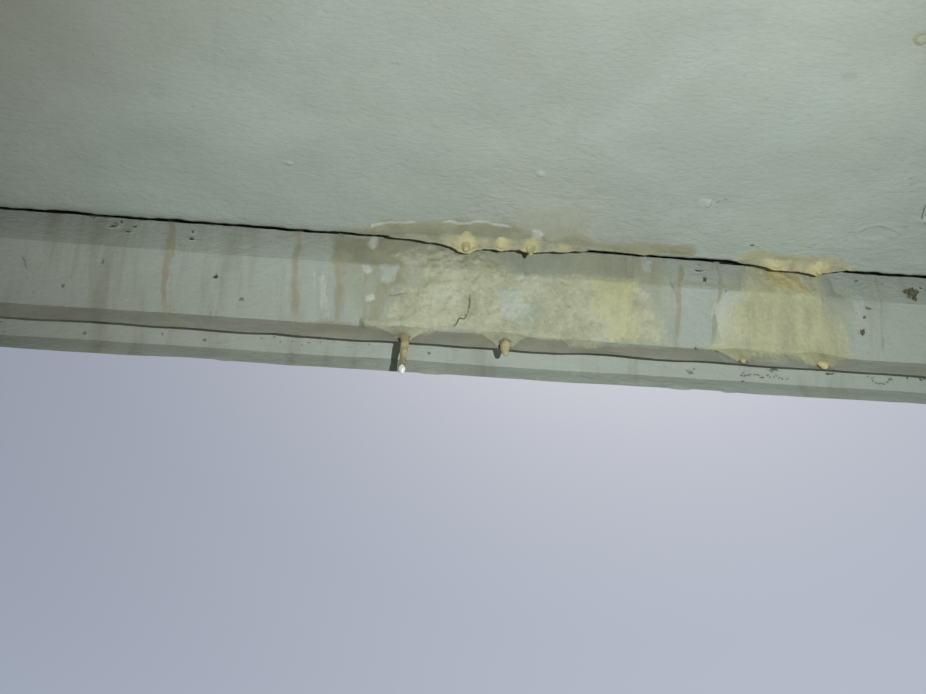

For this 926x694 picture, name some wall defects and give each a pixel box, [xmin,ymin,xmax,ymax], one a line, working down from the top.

crack [0,207,391,238]
crack [573,250,763,267]
crack [839,270,926,279]
water stain [331,219,854,367]
peeling [902,286,924,301]